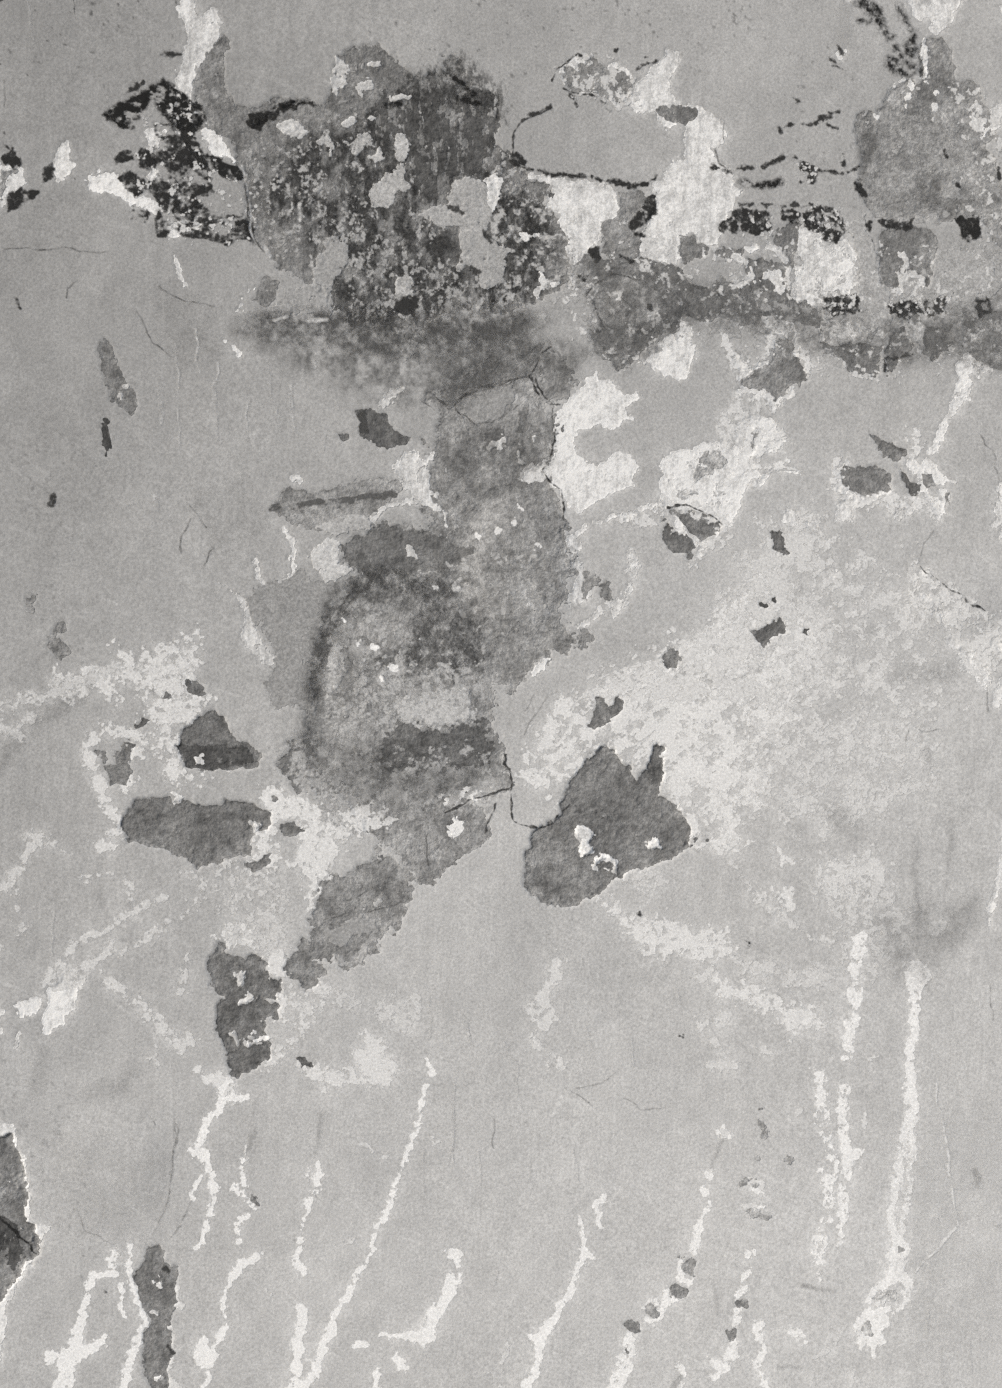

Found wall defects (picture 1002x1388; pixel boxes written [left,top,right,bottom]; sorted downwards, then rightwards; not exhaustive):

spalling [0,0,1002,1096]
water stain [839,931,880,1061]
spalling [0,1123,51,1361]
water stain [44,1242,150,1388]
spalling [132,1244,179,1388]
water stain [162,1266,185,1388]
water stain [187,1078,265,1388]
water stain [286,1057,464,1388]
water stain [487,1193,611,1388]
water stain [641,1168,714,1324]
water stain [706,1248,771,1388]
water stain [788,959,951,1388]